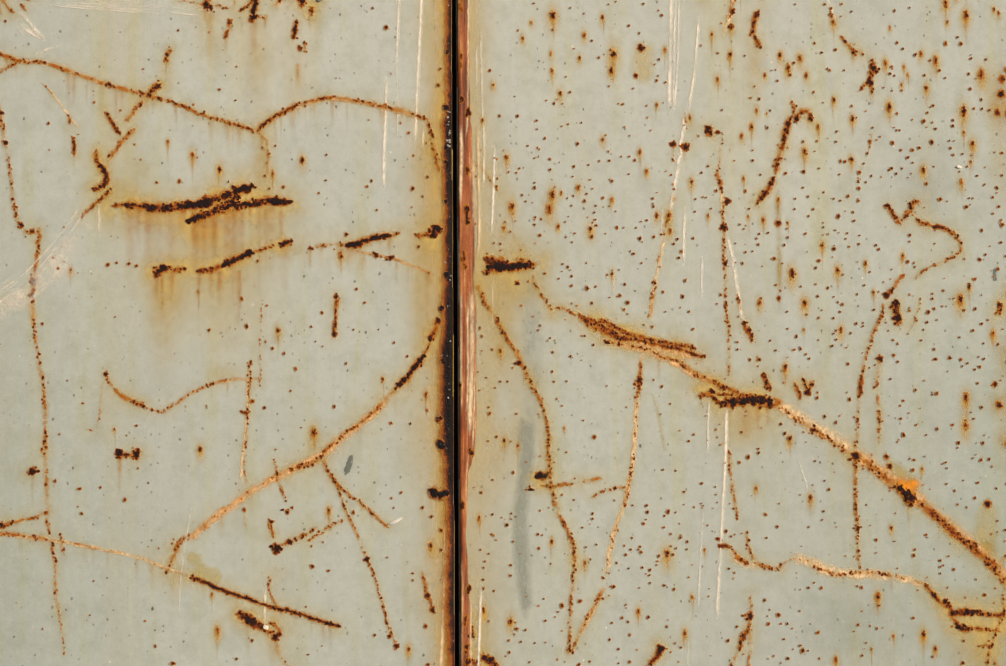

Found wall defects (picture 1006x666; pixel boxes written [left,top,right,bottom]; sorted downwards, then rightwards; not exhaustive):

corrosion [104,170,296,248]
corrosion [268,238,288,253]
corrosion [146,257,248,291]
corrosion [499,255,530,290]
corrosion [414,0,499,666]
corrosion [589,314,683,361]
corrosion [695,376,781,414]
corrosion [525,471,602,491]
corrosion [884,454,923,504]
corrosion [235,610,282,642]
corrosion [924,583,1006,666]